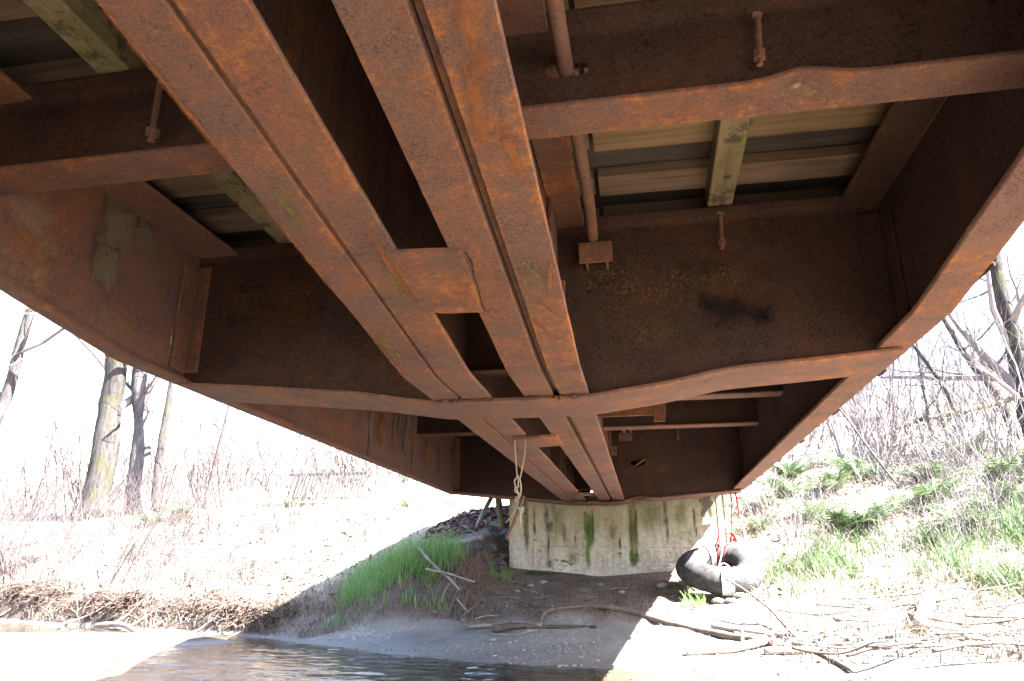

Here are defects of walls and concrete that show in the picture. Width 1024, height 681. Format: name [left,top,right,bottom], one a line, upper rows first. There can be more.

rust [128,40,216,145]
rust [267,208,327,283]
leakage [523,506,558,566]
leakage [571,513,594,565]
leakage [629,515,638,566]